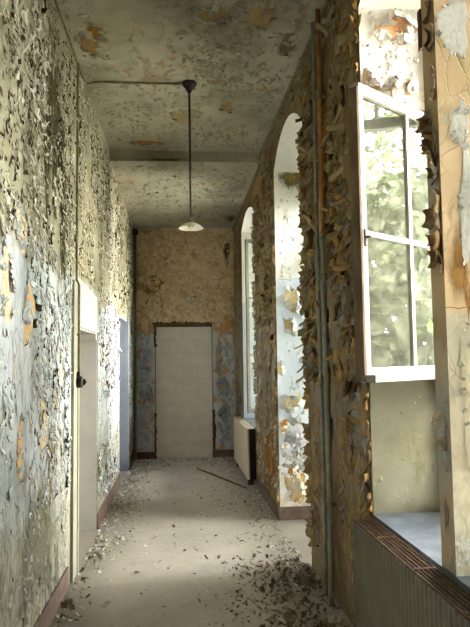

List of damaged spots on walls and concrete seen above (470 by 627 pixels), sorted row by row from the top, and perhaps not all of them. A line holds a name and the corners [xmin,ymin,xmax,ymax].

peeling [362,50,419,104]
peeling [363,7,423,63]
peeling [422,0,470,59]
peeling [413,63,442,275]
peeling [450,97,470,266]
peeling [0,0,373,615]